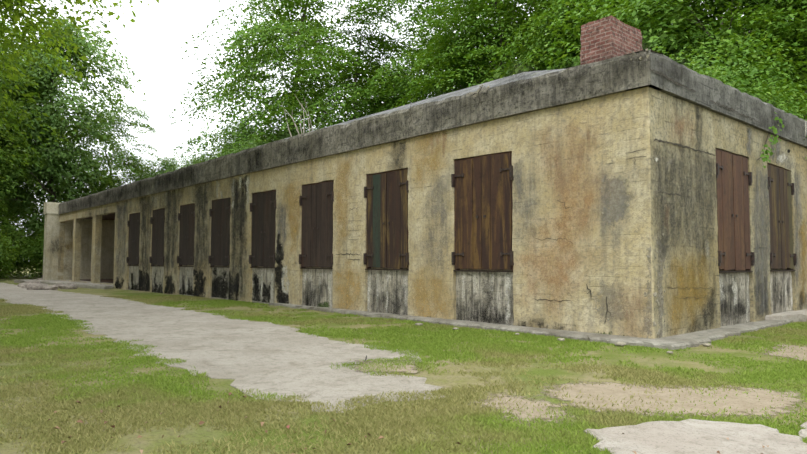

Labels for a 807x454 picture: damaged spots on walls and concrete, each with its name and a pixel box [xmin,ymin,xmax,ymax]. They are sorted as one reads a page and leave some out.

leakage [68,151,262,301]
leakage [252,187,299,304]
crack [535,284,611,322]
leakage [655,152,713,250]
leakage [669,176,807,329]